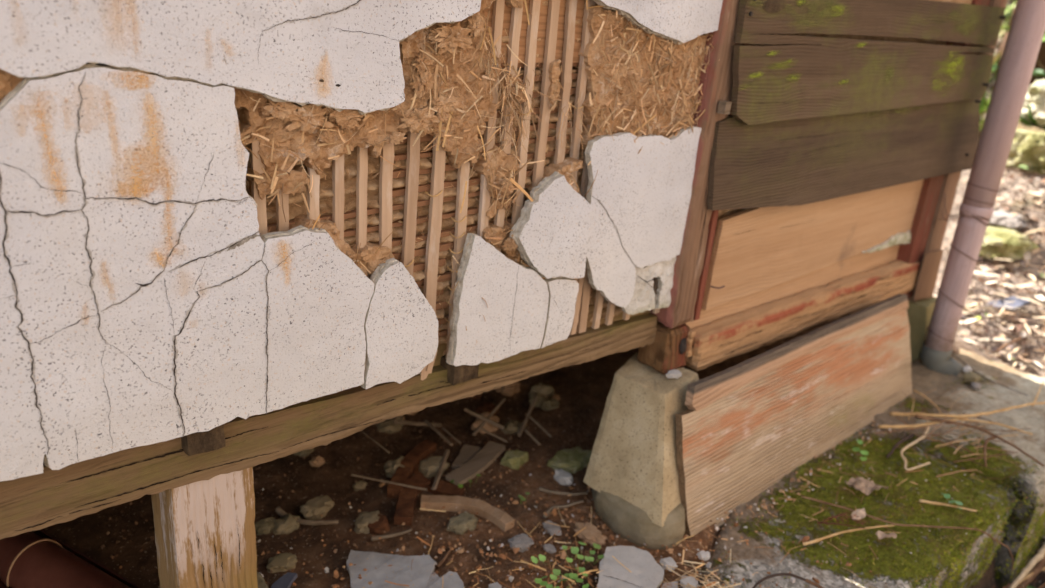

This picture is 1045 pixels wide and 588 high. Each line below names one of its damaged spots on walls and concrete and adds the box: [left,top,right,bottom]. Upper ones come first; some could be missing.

crack [258,0,400,66]
spalling [234,0,714,279]
crack [0,63,312,455]
crack [598,200,661,294]
spalling [622,257,677,315]